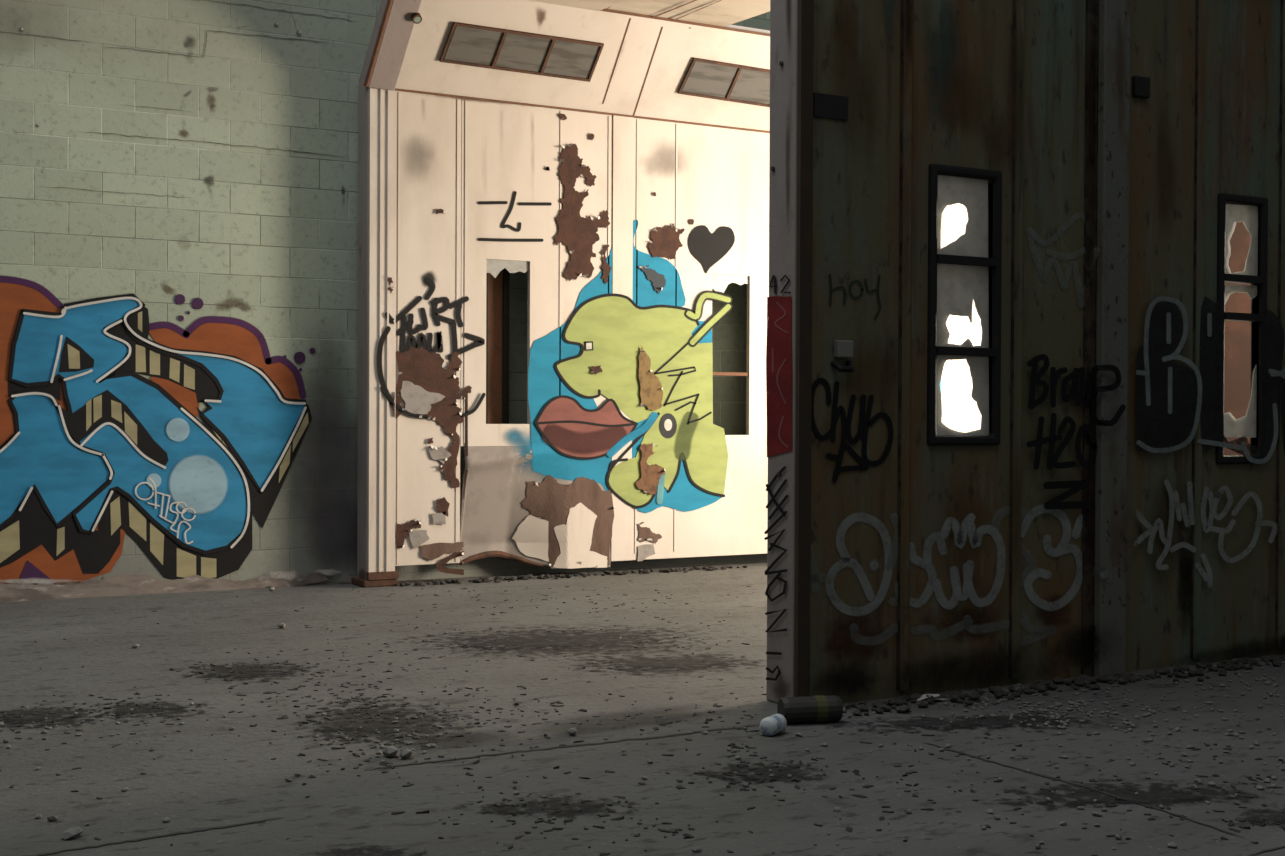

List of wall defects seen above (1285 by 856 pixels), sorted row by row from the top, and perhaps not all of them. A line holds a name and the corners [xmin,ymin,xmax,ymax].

peeling [546,134,611,284]
peeling [638,219,694,294]
peeling [393,347,472,575]
peeling [512,475,614,569]